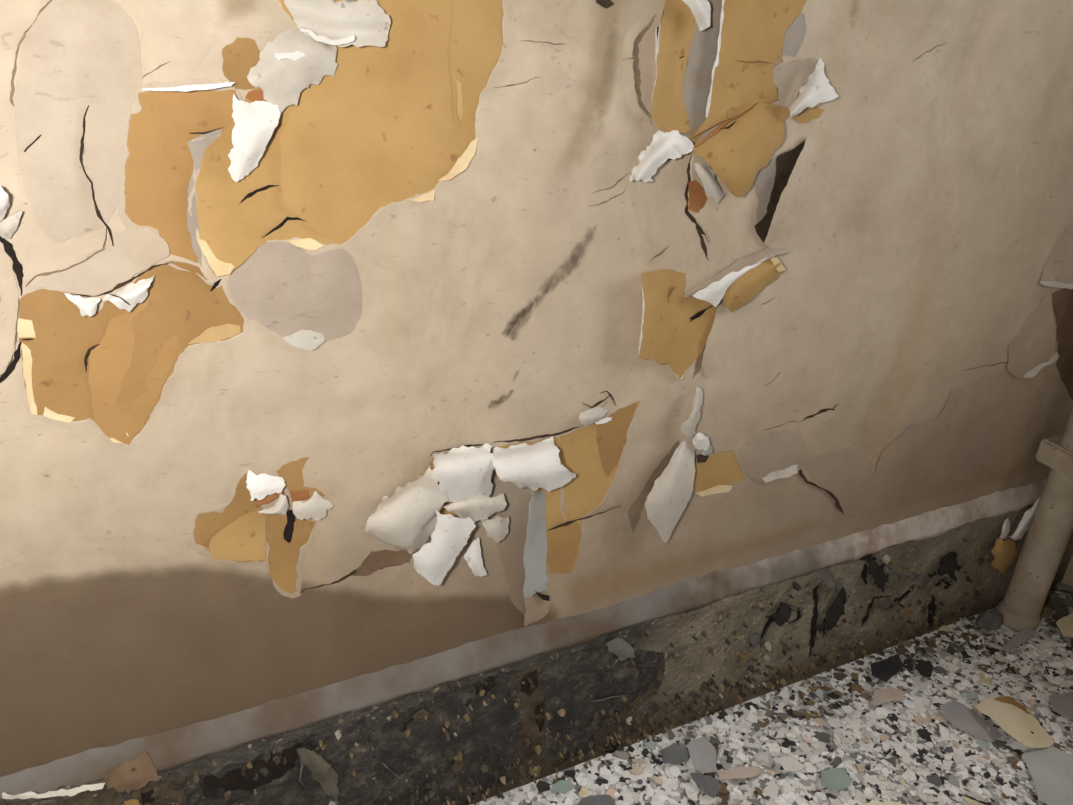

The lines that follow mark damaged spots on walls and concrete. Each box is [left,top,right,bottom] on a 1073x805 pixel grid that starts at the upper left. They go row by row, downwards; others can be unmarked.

crack [0,186,24,296]
peeling [12,0,517,453]
crack [662,155,717,260]
crack [0,342,22,383]
peeling [353,0,839,627]
peeling [1007,224,1073,400]
peeling [183,457,334,598]
crack [799,461,844,514]